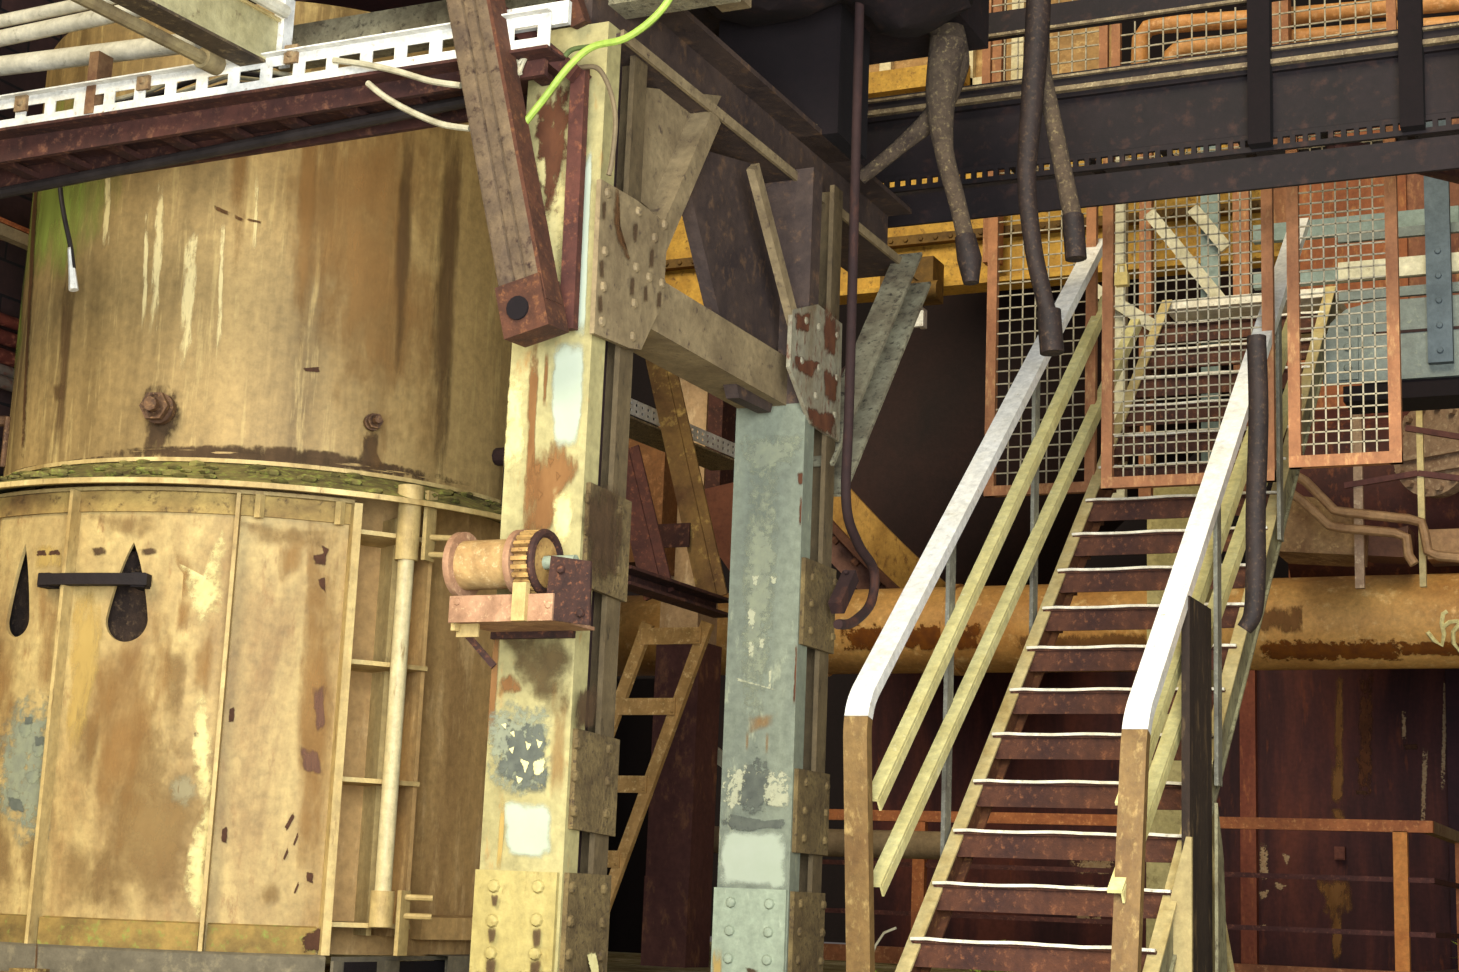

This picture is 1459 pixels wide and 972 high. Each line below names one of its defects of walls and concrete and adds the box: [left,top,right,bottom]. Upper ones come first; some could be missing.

damp [142,198,163,319]
damp [181,239,197,356]
damp [397,172,409,330]
damp [437,158,459,401]
corrosion [795,308,838,437]
corrosion [523,350,548,530]
corrosion [841,624,885,650]
corrosion [905,623,941,650]
peeling [0,696,48,844]
peeling [489,704,549,795]
peeling [722,758,789,831]
corrosion [1260,606,1459,819]